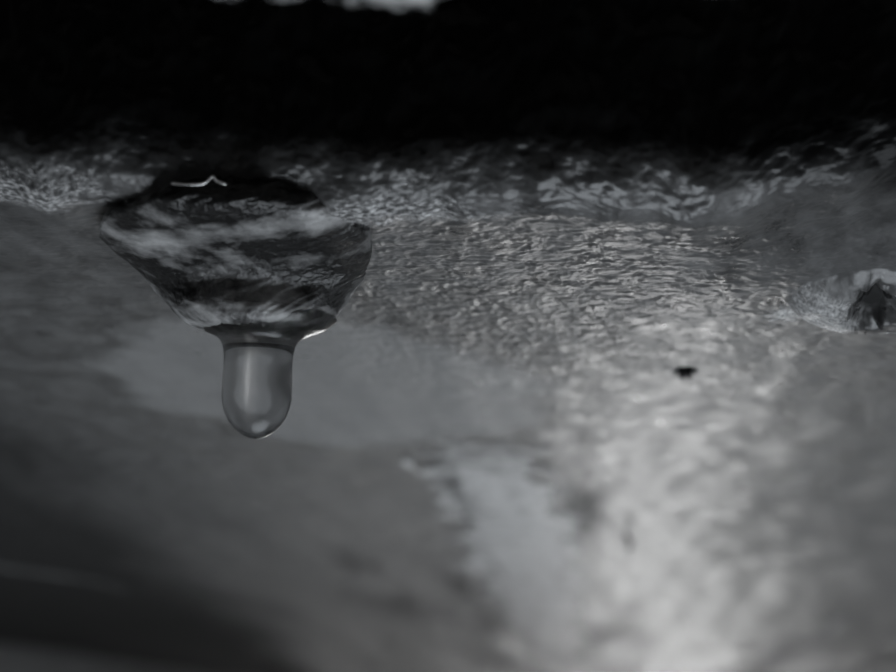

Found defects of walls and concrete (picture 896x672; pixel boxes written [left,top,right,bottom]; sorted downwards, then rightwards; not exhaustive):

spalling [770,286,855,332]